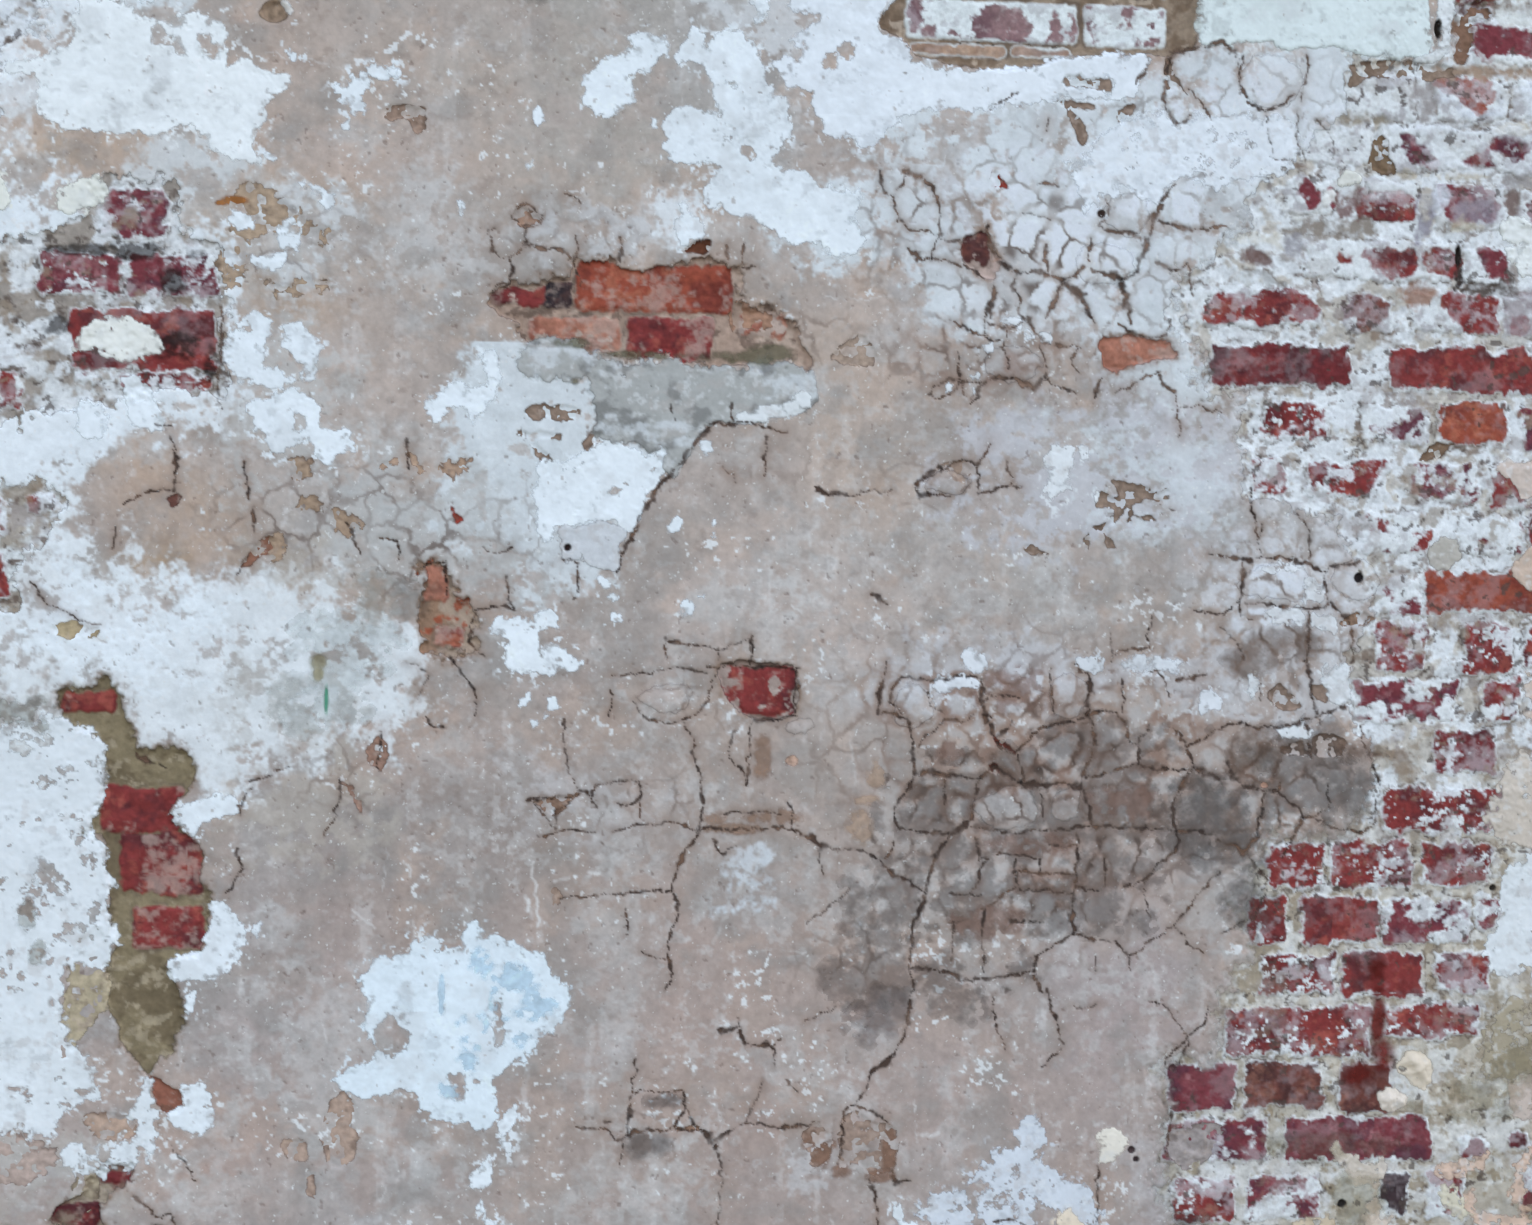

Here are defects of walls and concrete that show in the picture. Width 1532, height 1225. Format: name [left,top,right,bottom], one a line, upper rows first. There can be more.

peeling [0,0,297,164]
peeling [334,63,402,130]
crack [1135,39,1334,160]
flaking render [0,171,365,538]
crack [880,170,1227,436]
flaking render [0,475,68,613]
flaking render [416,559,584,677]
flaking render [487,0,1532,1225]
water stain [1226,627,1315,677]
crack [526,480,1380,1168]
peeling [0,675,262,1225]
crack [869,1171,909,1225]